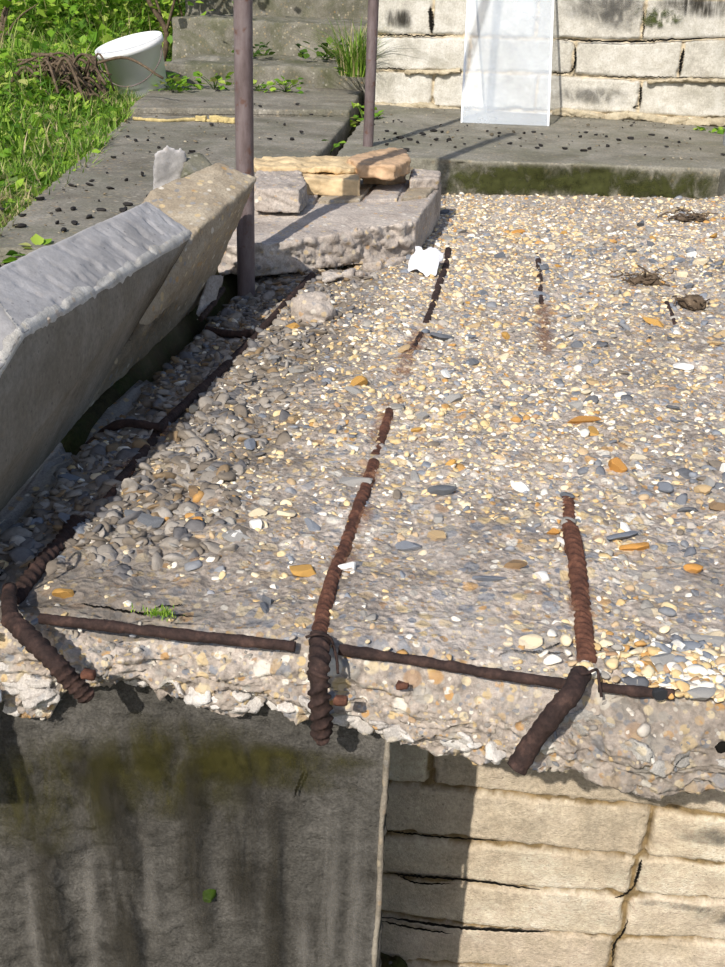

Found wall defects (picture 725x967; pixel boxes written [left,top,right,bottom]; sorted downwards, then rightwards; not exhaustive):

rust [536,304,552,351]
spalling [0,662,62,717]
spalling [168,680,311,715]
rust [395,680,409,690]
spalling [331,714,415,743]
spalling [440,732,507,765]
spalling [620,738,691,778]
crack [387,830,502,841]
crack [383,872,539,890]
crack [615,860,642,898]
crack [382,917,549,934]
crack [611,921,628,964]